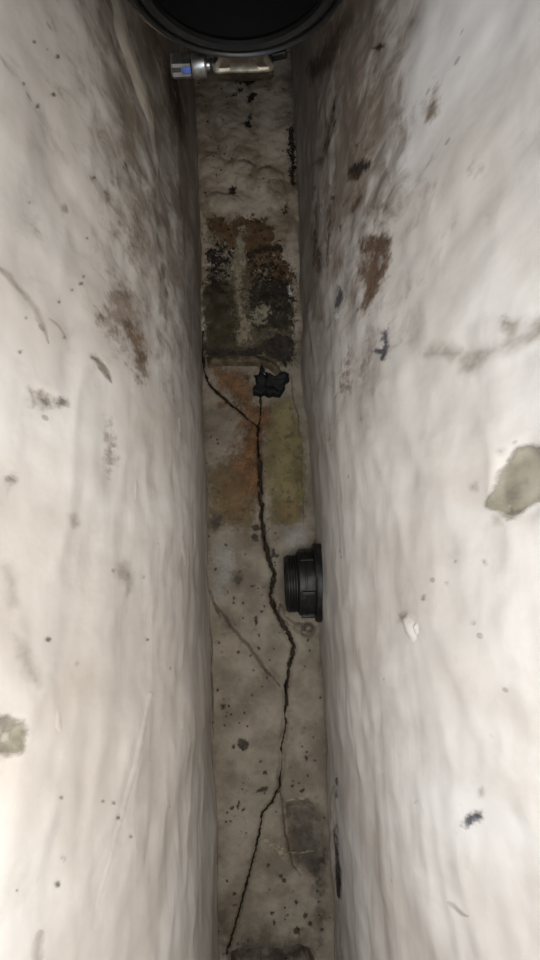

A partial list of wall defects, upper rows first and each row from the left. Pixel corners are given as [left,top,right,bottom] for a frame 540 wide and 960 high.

water stain [201,225,300,368]
corrosion [214,368,270,518]
spalling [486,445,540,518]
crack [202,331,297,955]